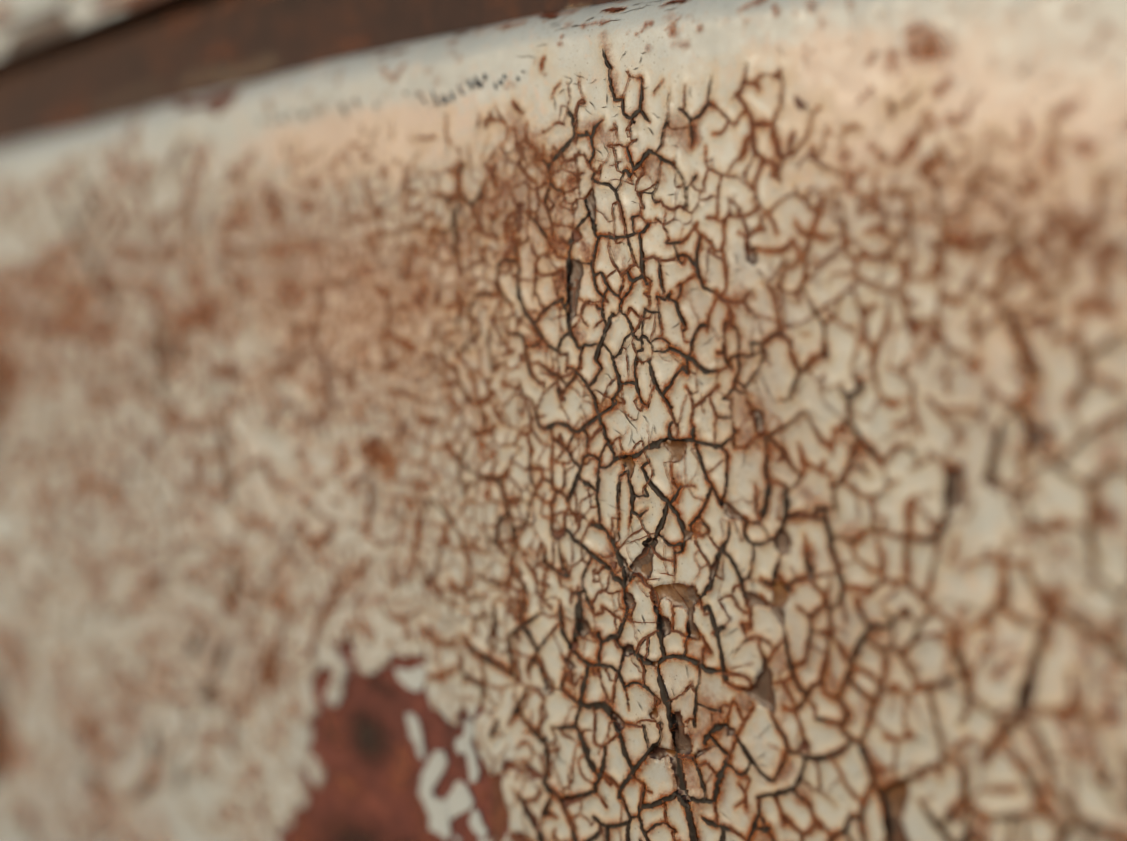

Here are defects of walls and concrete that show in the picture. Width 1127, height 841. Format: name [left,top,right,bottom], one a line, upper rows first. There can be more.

corrosion [0,0,623,148]
crack [214,48,1127,841]
peeling [275,641,545,841]